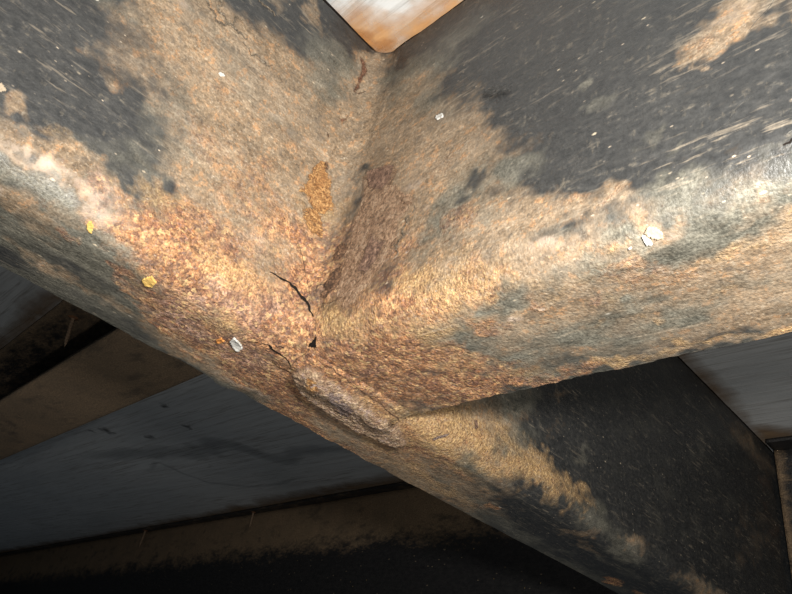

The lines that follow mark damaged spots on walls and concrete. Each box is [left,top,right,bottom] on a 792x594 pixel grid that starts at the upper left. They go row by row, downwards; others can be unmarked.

rust [347,0,462,53]
crack [270,229,314,317]
rust [299,161,334,237]
rust [336,165,416,308]
crack [247,341,310,368]